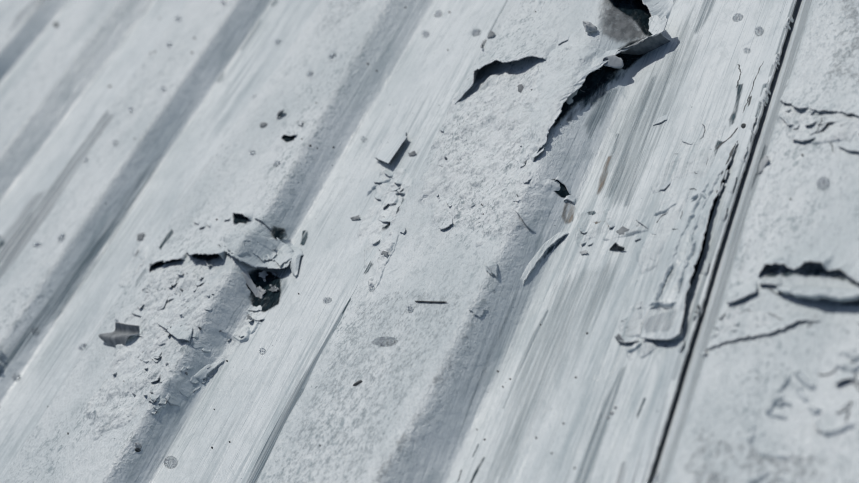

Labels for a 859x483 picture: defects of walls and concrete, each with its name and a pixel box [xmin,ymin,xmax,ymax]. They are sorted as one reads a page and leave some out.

peeling [82,200,307,441]
peeling [351,132,416,270]
peeling [575,0,859,483]